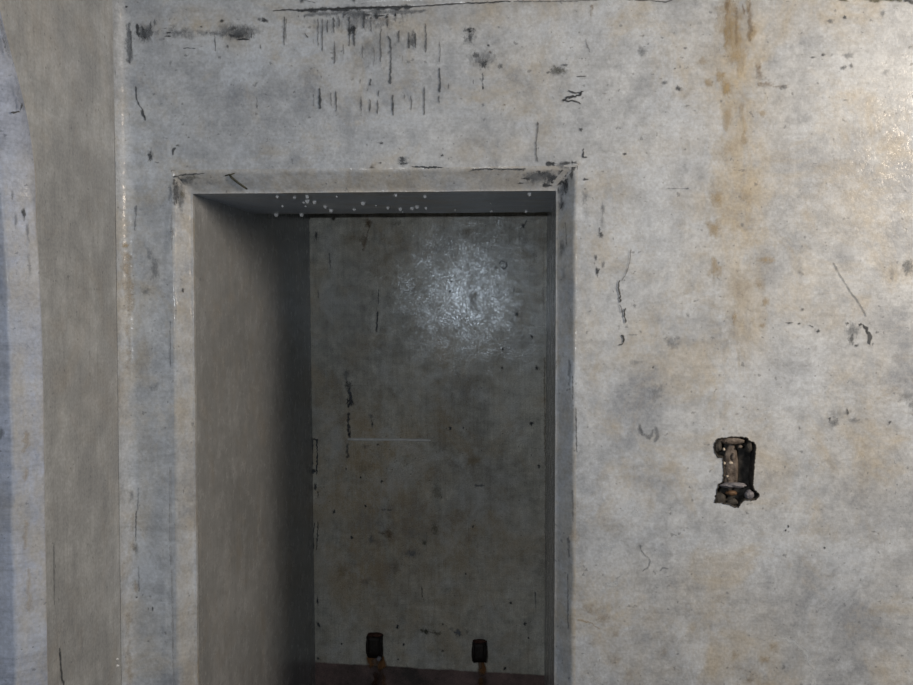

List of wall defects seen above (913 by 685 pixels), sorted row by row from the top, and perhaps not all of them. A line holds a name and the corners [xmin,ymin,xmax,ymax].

crack [273,1,511,13]